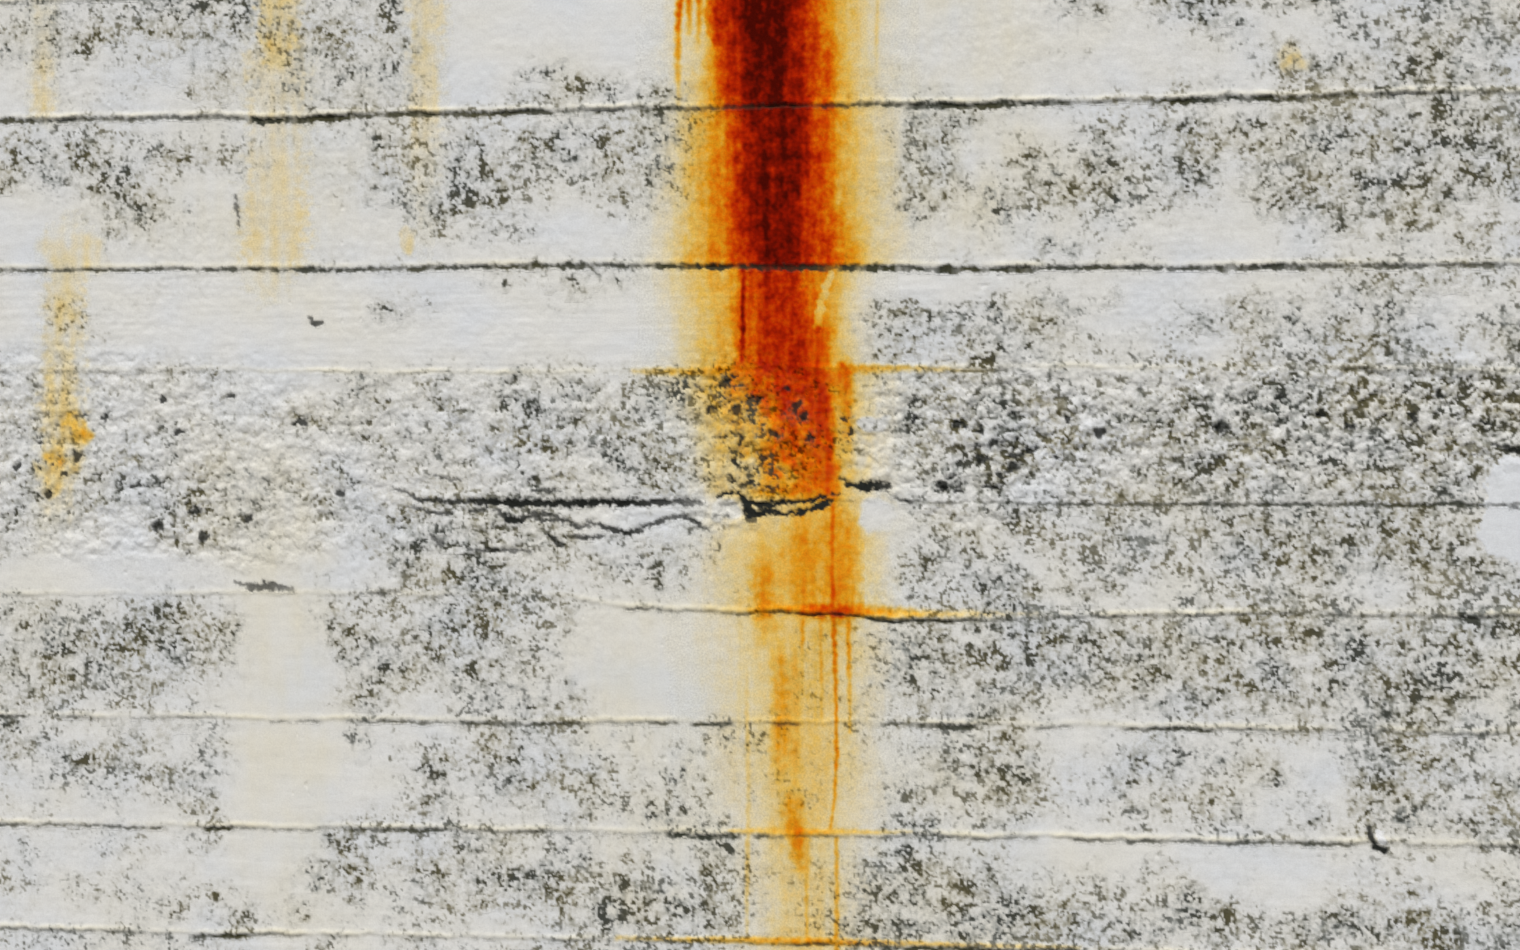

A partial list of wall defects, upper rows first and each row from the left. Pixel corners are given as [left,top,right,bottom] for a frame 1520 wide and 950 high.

water stain [0,0,818,950]
corrosion [612,0,972,950]
crack [389,470,1520,556]
water stain [837,0,1520,950]
spalling [1164,353,1343,439]
spalling [1313,407,1364,453]
spalling [1379,356,1496,453]
corrosion [1013,941,1084,950]